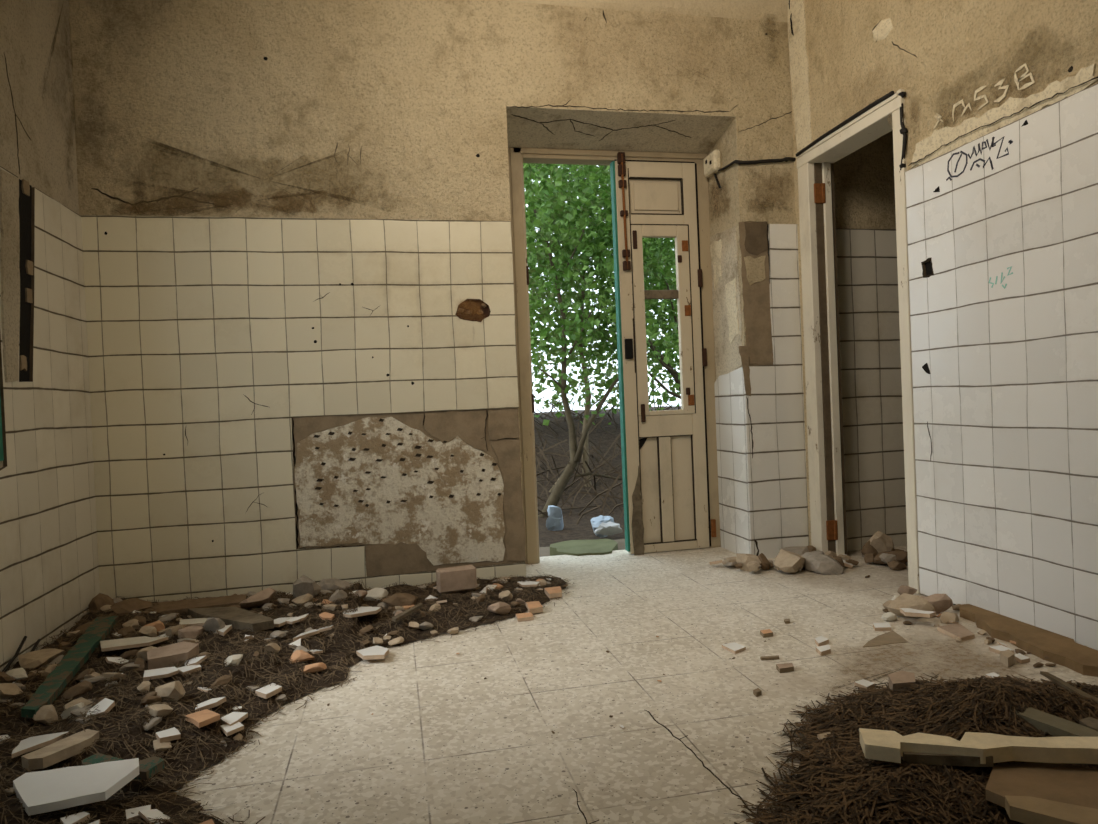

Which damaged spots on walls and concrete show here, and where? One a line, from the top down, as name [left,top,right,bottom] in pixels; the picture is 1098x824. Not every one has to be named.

flaking render [909,64,1098,169]
water stain [131,144,372,213]
spalling [458,300,488,319]
flaking render [710,221,773,396]
spalling [292,408,526,576]